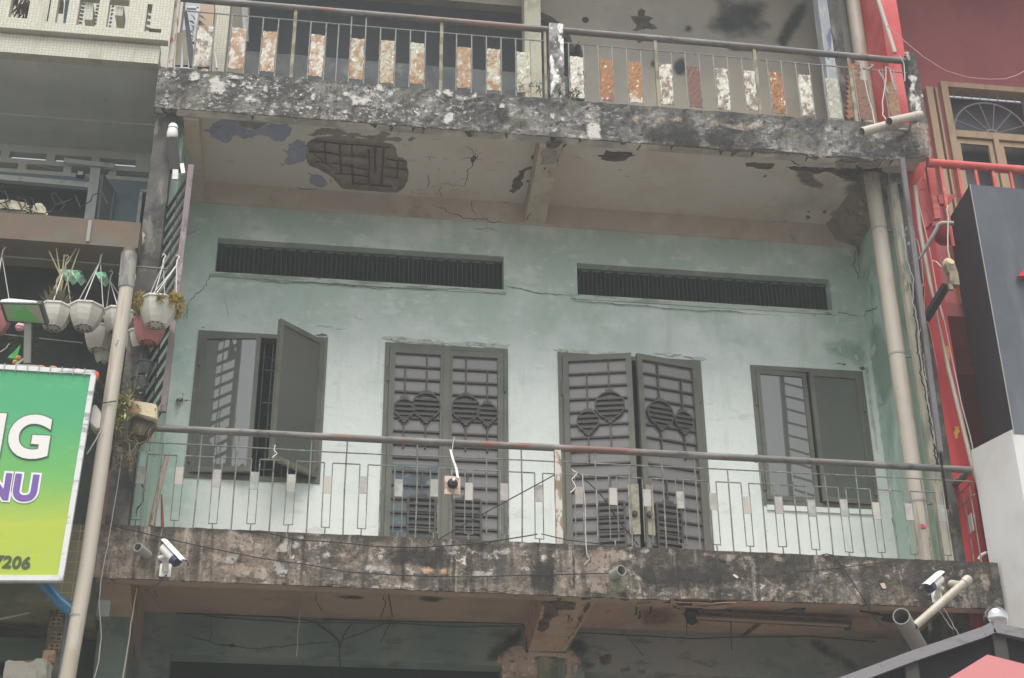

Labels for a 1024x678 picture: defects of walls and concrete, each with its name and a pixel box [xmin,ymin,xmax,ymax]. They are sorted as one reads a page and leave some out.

leakage [778,5,805,46]
spalling [204,119,416,193]
flaking render [509,113,635,193]
leakage [646,125,733,146]
crack [394,124,531,231]
leakage [392,548,450,581]
leakage [531,560,555,590]
leakage [641,566,744,585]
flaking render [537,597,591,632]